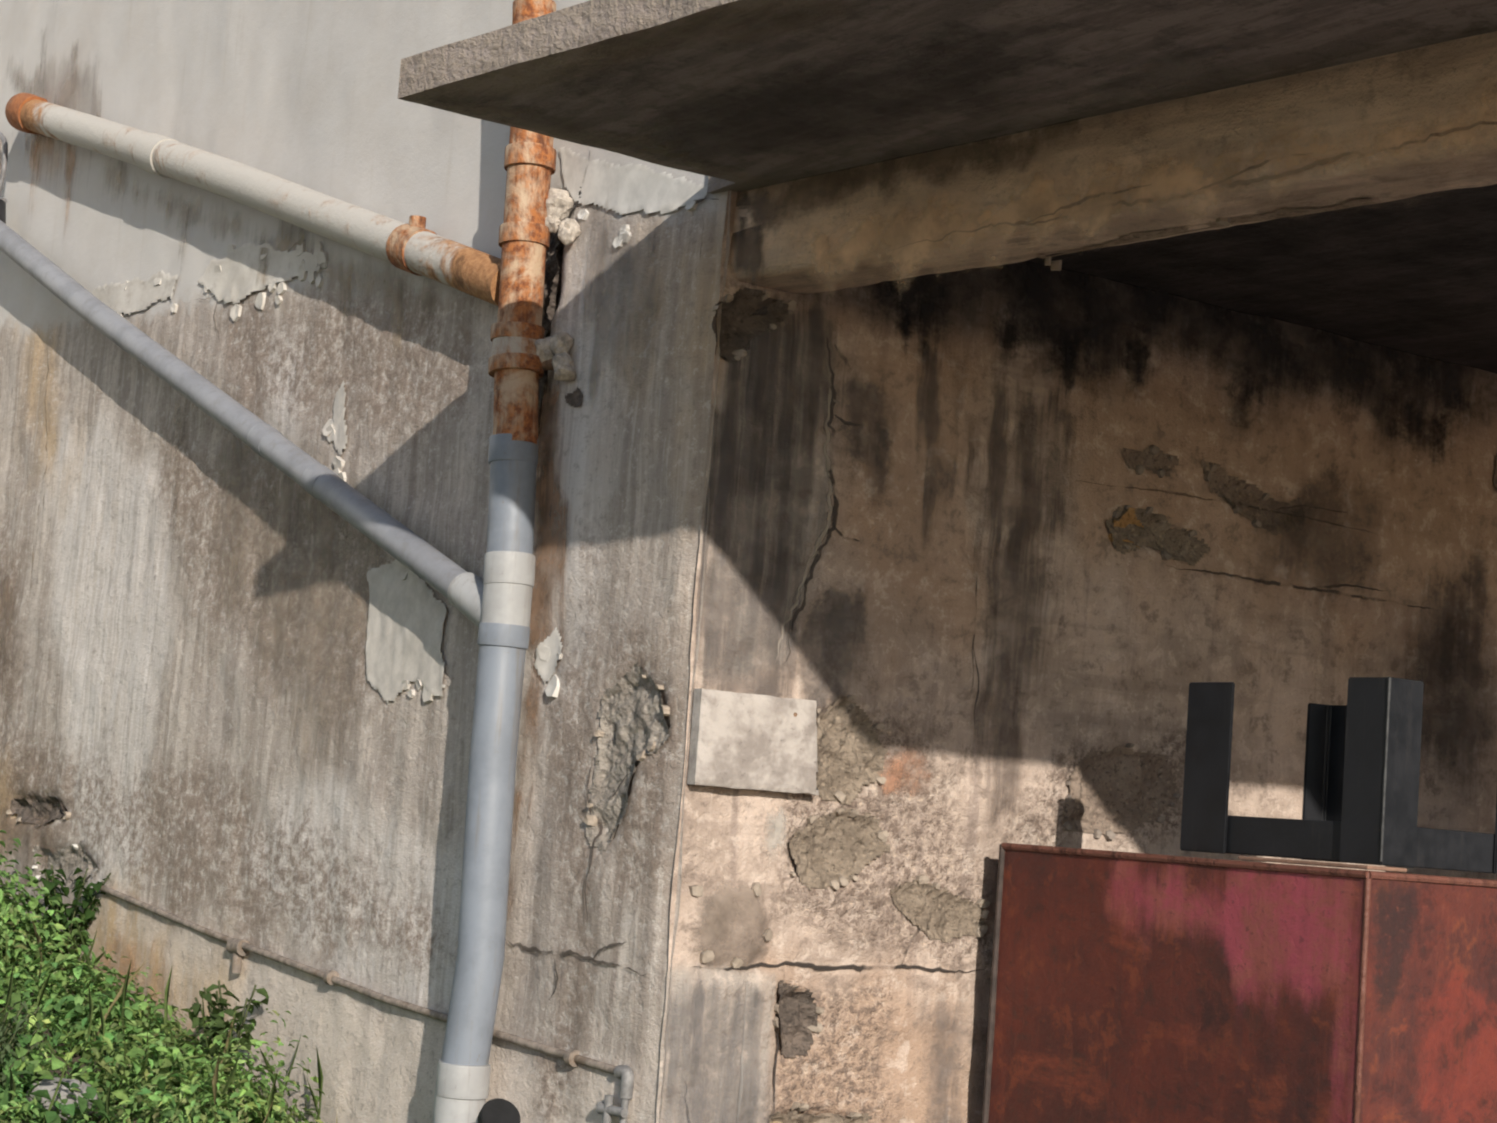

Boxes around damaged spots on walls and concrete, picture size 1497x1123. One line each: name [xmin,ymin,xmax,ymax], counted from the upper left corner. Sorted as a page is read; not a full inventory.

peeling [92,271,178,317]
peeling [198,240,329,322]
spalling [712,287,797,361]
leakage [1126,341,1150,386]
crack [775,338,861,663]
spalling [1106,505,1210,566]
spalling [1201,458,1306,536]
peeling [366,559,447,703]
spalling [584,664,670,853]
spalling [772,980,824,1058]
crack [694,928,984,1114]
spalling [768,1102,872,1123]